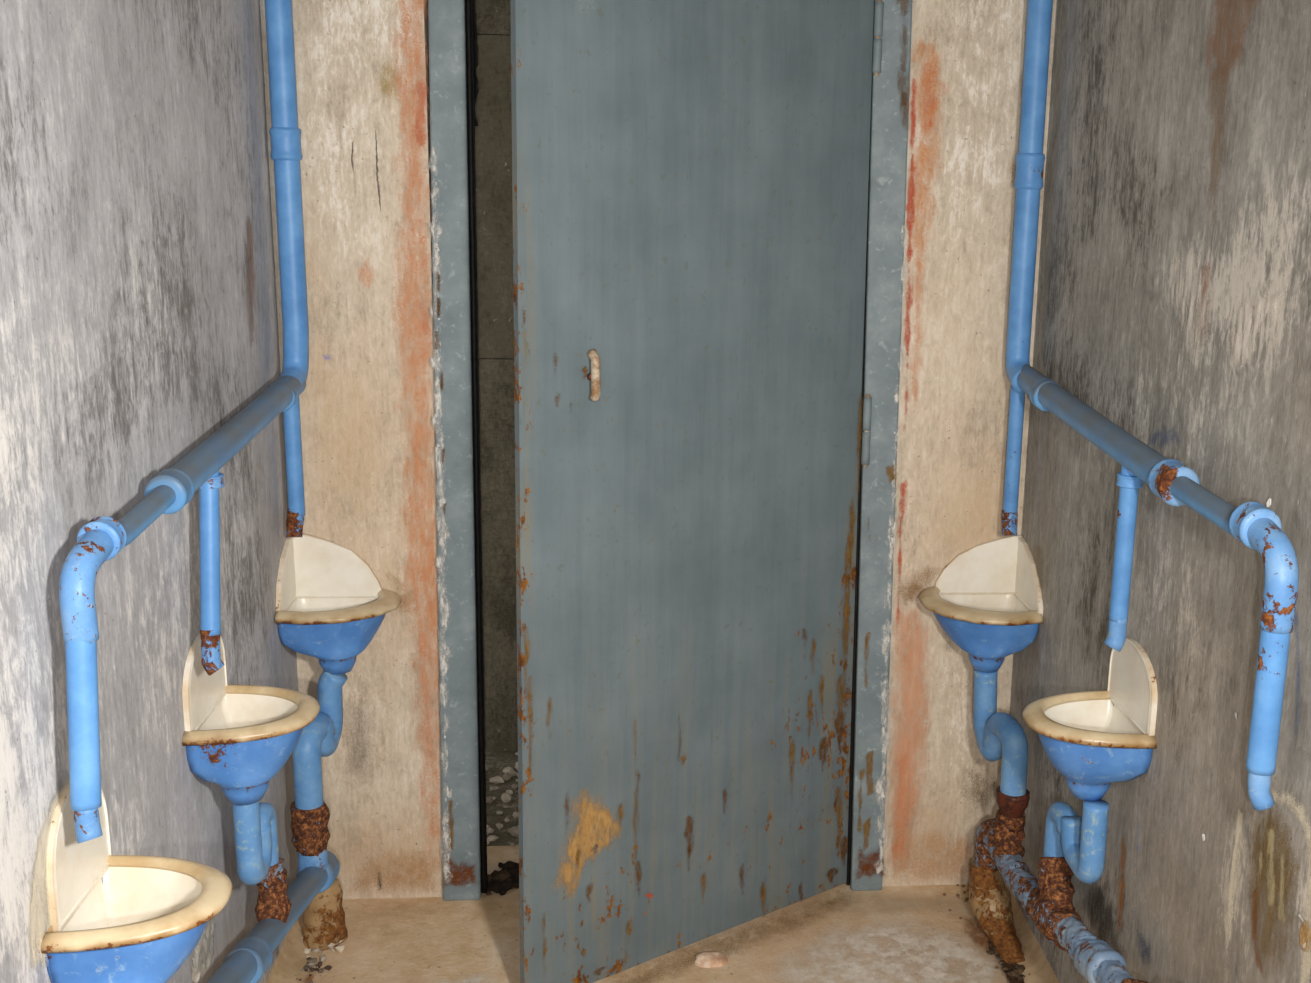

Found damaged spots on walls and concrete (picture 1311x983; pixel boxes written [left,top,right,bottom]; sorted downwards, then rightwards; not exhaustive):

rust [355,0,479,888]
rust [903,29,952,432]